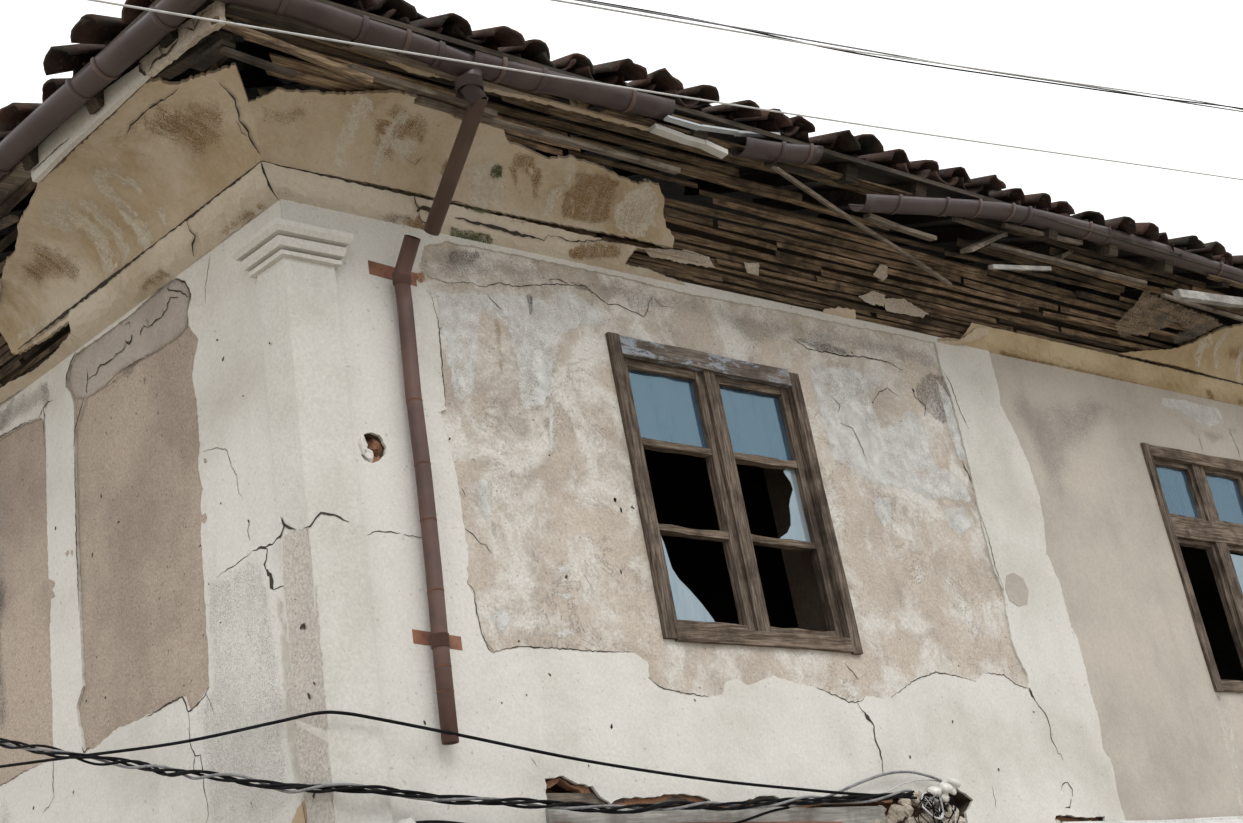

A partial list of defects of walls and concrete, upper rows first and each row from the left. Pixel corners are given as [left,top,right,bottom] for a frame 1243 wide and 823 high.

crack [127,8,211,133]
water stain [334,92,430,175]
water stain [20,168,170,287]
crack [18,83,702,350]
water stain [464,153,659,260]
water stain [1115,291,1243,383]
peeling [0,417,56,786]
peeling [65,318,335,823]
crack [206,447,421,590]
peeling [419,242,1029,703]
crack [847,666,883,770]
crack [1029,688,1073,808]